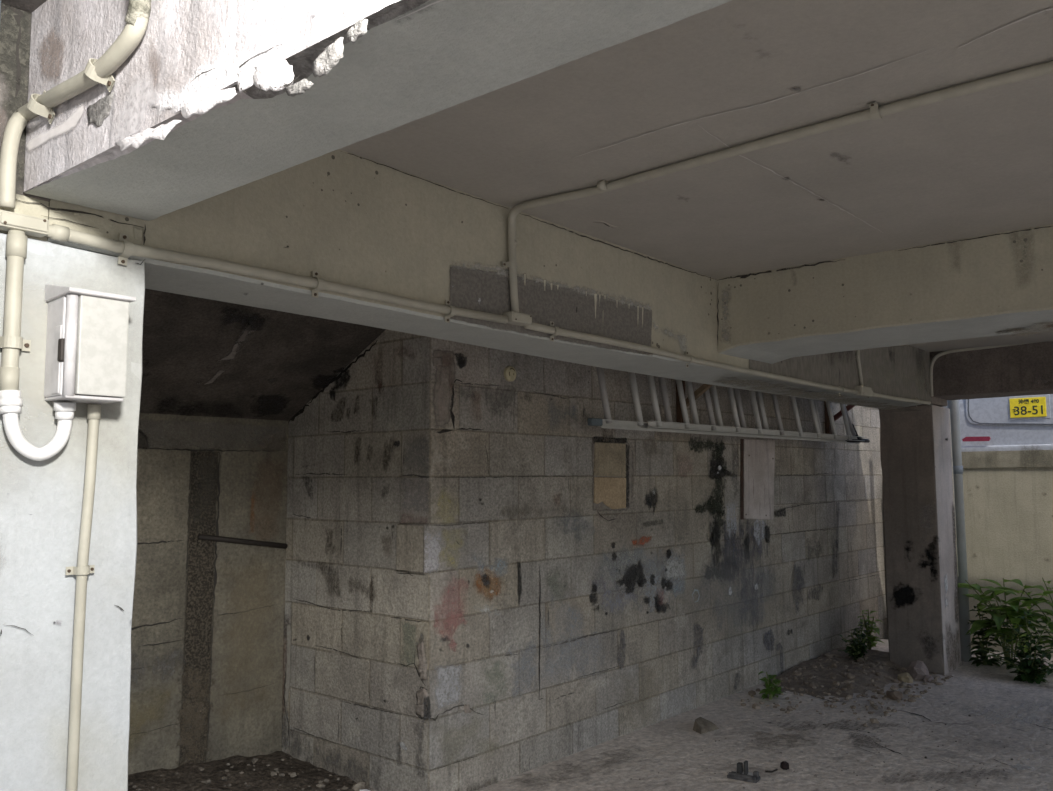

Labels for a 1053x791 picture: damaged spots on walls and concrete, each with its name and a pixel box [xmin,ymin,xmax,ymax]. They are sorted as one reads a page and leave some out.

peeling [115,19,368,151]
peeling [26,92,114,151]
crack [896,226,1052,251]
damp [313,367,350,400]
crack [137,445,280,453]
damp [689,438,763,622]
crack [131,618,183,670]